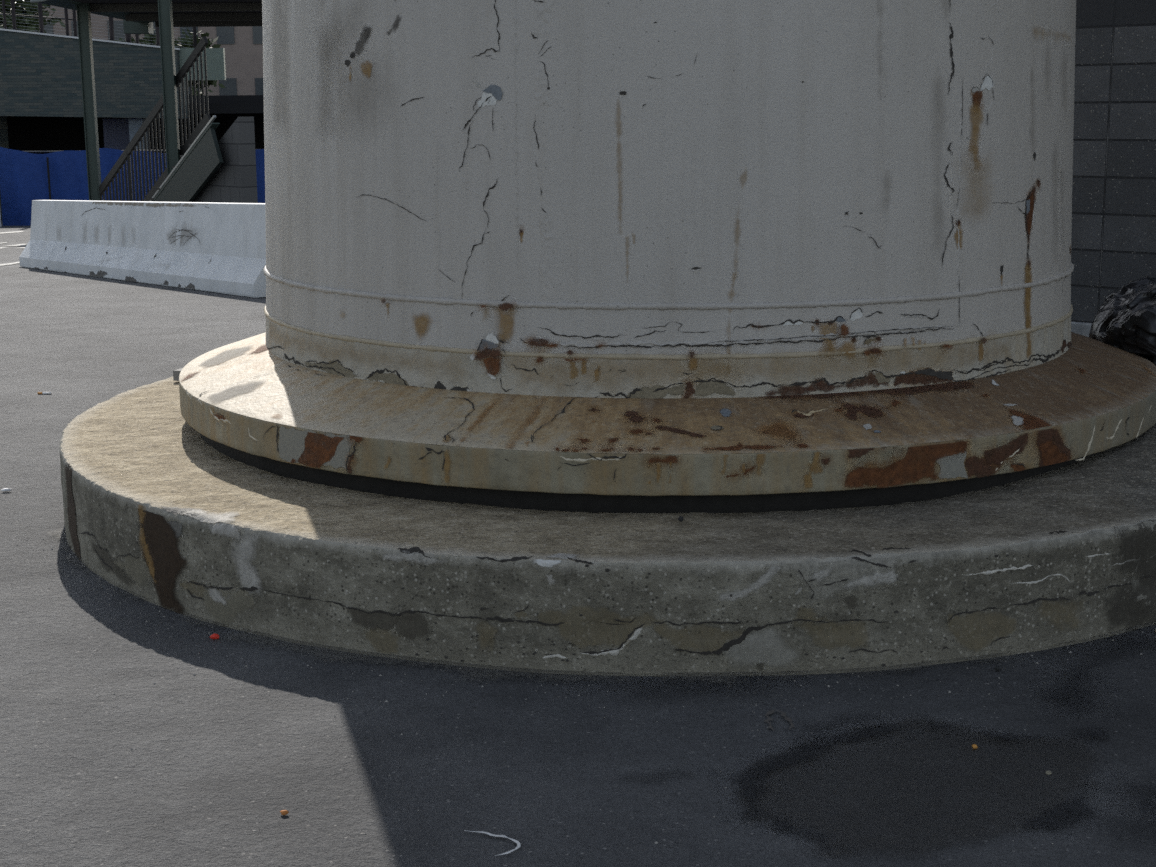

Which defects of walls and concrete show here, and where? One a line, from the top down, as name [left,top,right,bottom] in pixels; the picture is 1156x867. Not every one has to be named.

crack [473,0,500,60]
crack [942,0,955,91]
crack [934,142,954,290]
rust [998,180,1040,356]
peeling [733,308,882,331]
spalling [267,346,472,392]
peeling [470,333,511,392]
crack [511,322,710,442]
spalling [581,337,1072,399]
rust [767,382,972,420]
rust [276,424,362,474]
rust [845,404,1070,487]